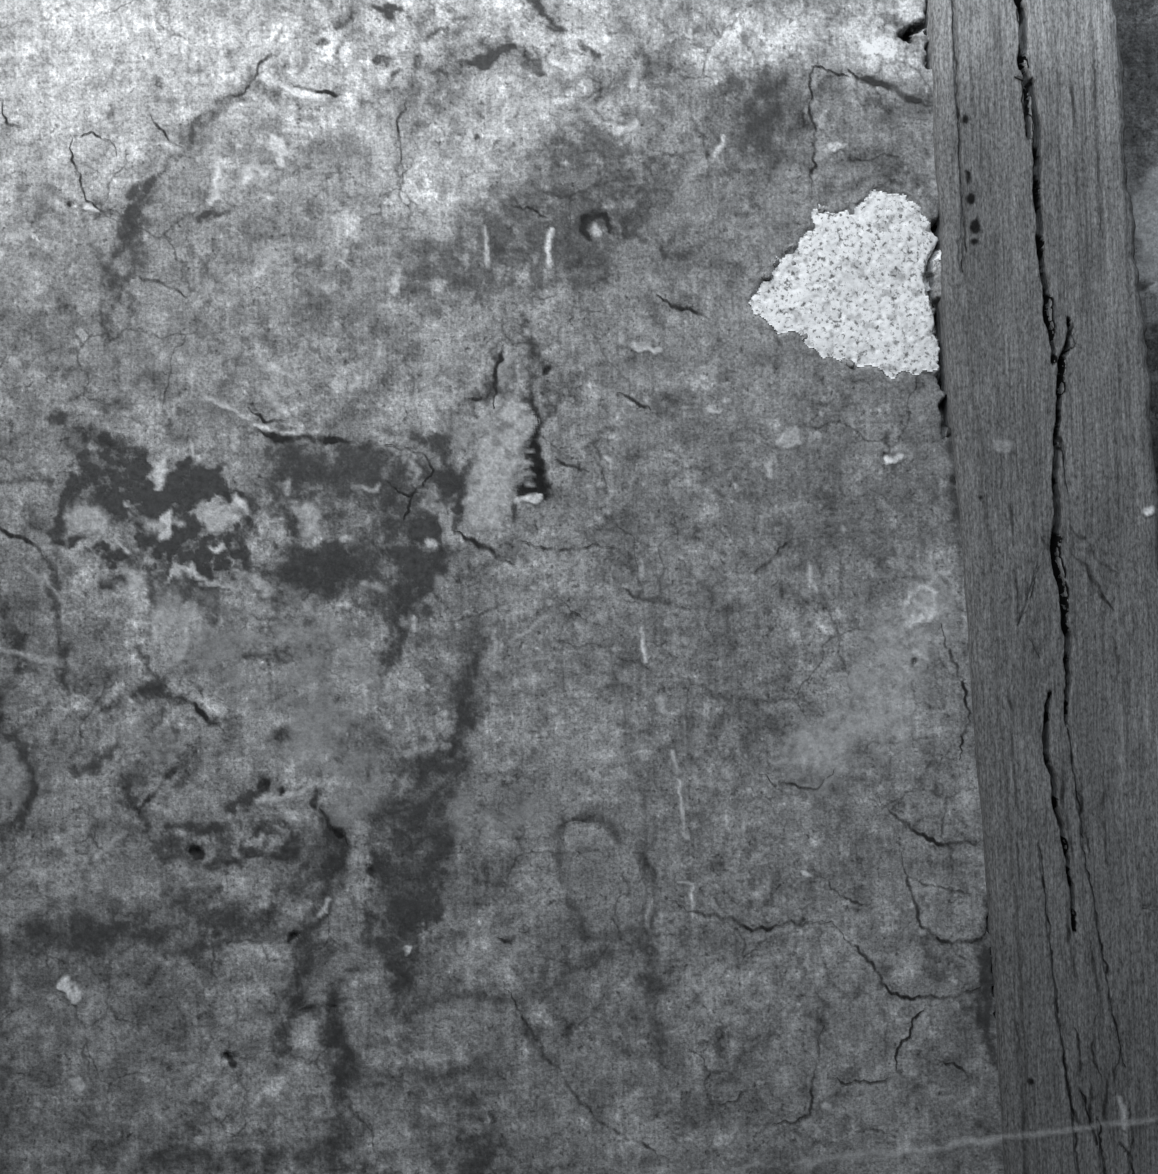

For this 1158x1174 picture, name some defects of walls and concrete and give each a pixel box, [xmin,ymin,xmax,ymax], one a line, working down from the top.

crack [803,0,967,329]
crack [468,345,504,408]
spalling [748,189,941,379]
water stain [0,716,38,840]
crack [0,527,42,553]
water stain [70,744,118,776]
water stain [136,645,185,704]
crack [170,696,224,731]
water stain [47,411,478,689]
water stain [365,653,479,991]
crack [1014,0,1135,1174]
crack [665,871,993,1125]